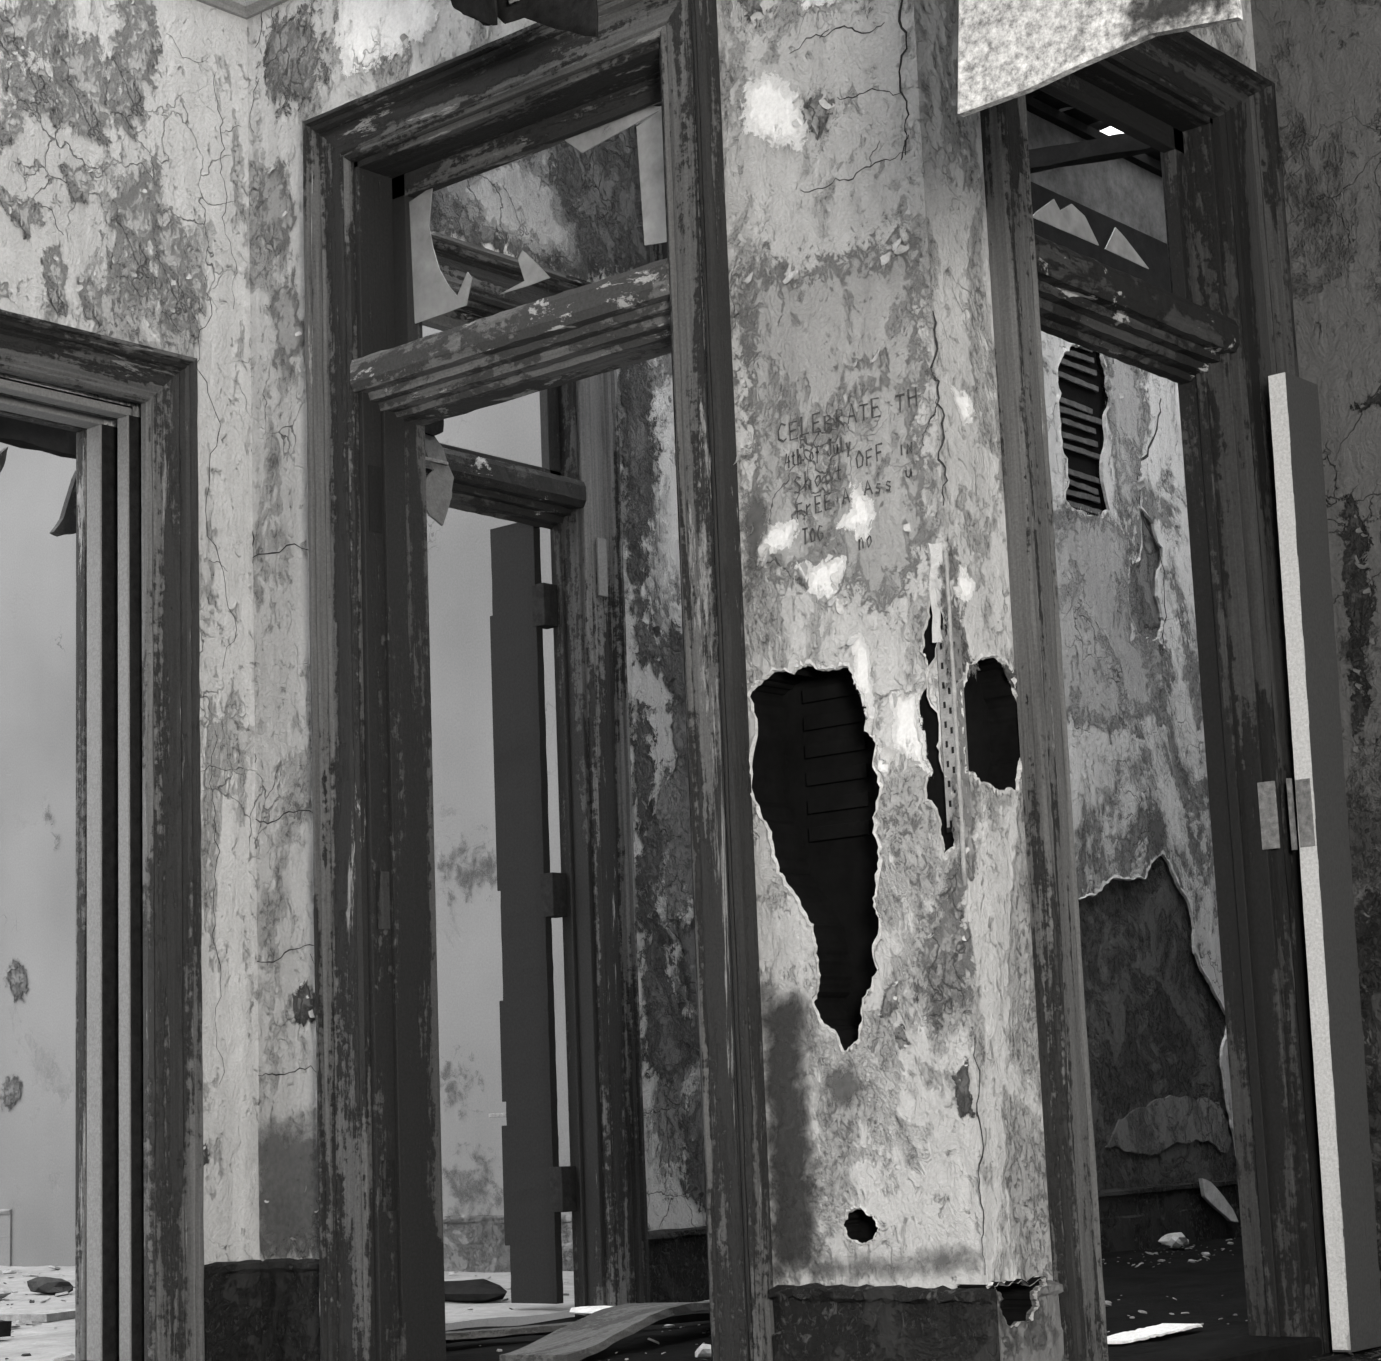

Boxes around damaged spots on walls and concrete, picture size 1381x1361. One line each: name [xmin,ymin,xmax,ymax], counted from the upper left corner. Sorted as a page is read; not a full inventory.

peeling [0,0,208,338]
peeling [738,68,836,156]
crack [789,0,910,193]
peeling [1053,342,1173,733]
crack [1341,493,1381,543]
peeling [729,218,1022,1055]
crack [203,731,257,1084]
crack [255,810,313,825]
crack [257,944,314,963]
crack [258,1065,316,1076]
flaking render [1078,850,1237,1190]
flaking render [840,1205,880,1246]